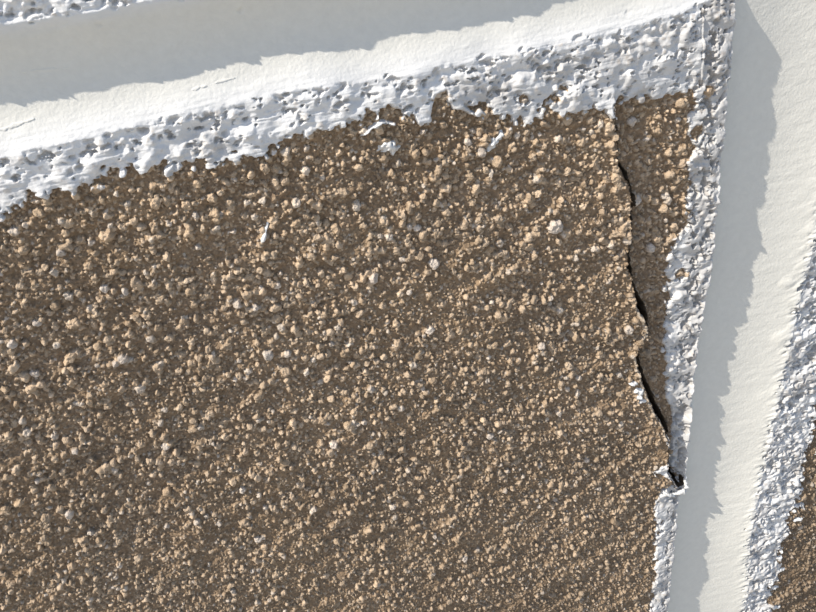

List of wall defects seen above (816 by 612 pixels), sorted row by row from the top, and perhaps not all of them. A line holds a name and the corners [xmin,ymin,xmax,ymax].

crack [614,105,684,490]